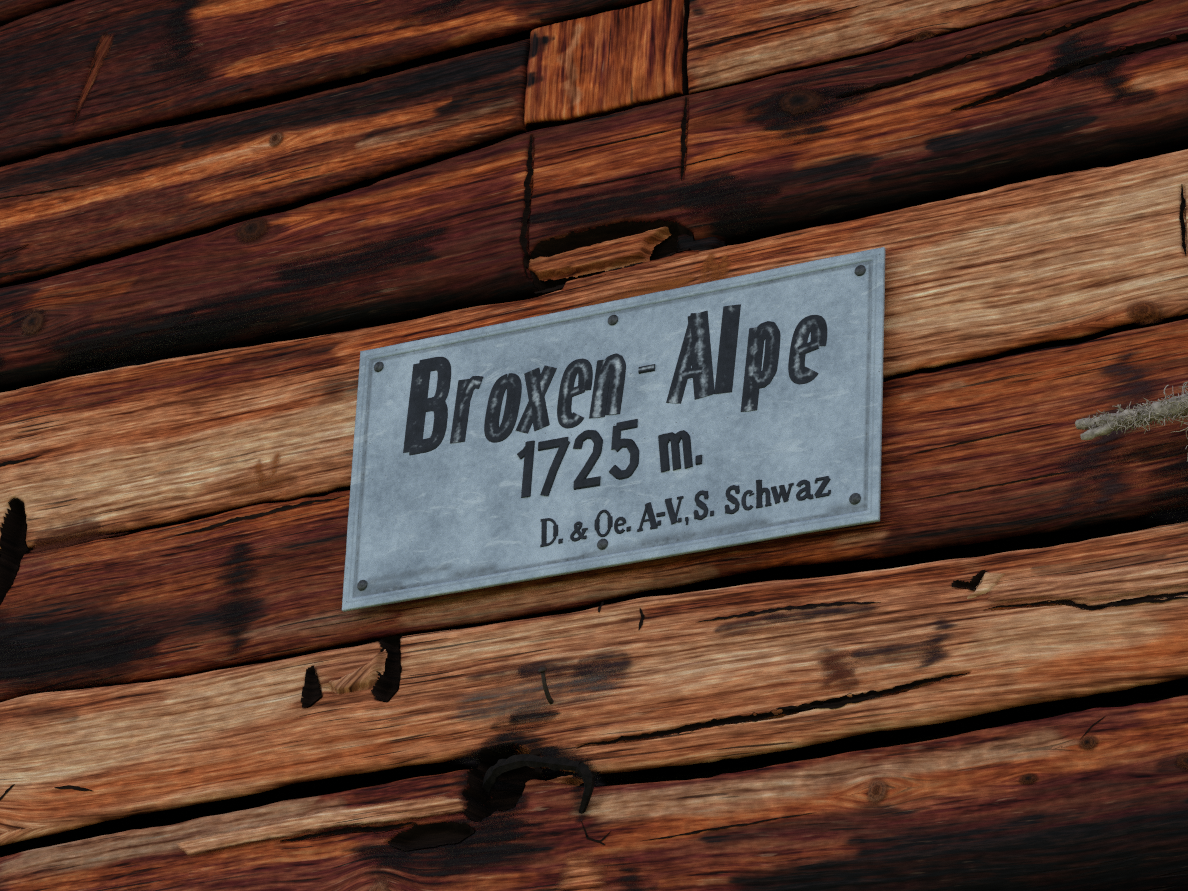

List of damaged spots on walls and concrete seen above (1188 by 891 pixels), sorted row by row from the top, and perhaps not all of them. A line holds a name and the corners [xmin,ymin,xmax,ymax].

crack [1178,185,1186,256]
crack [985,591,1188,610]
crack [577,672,969,748]